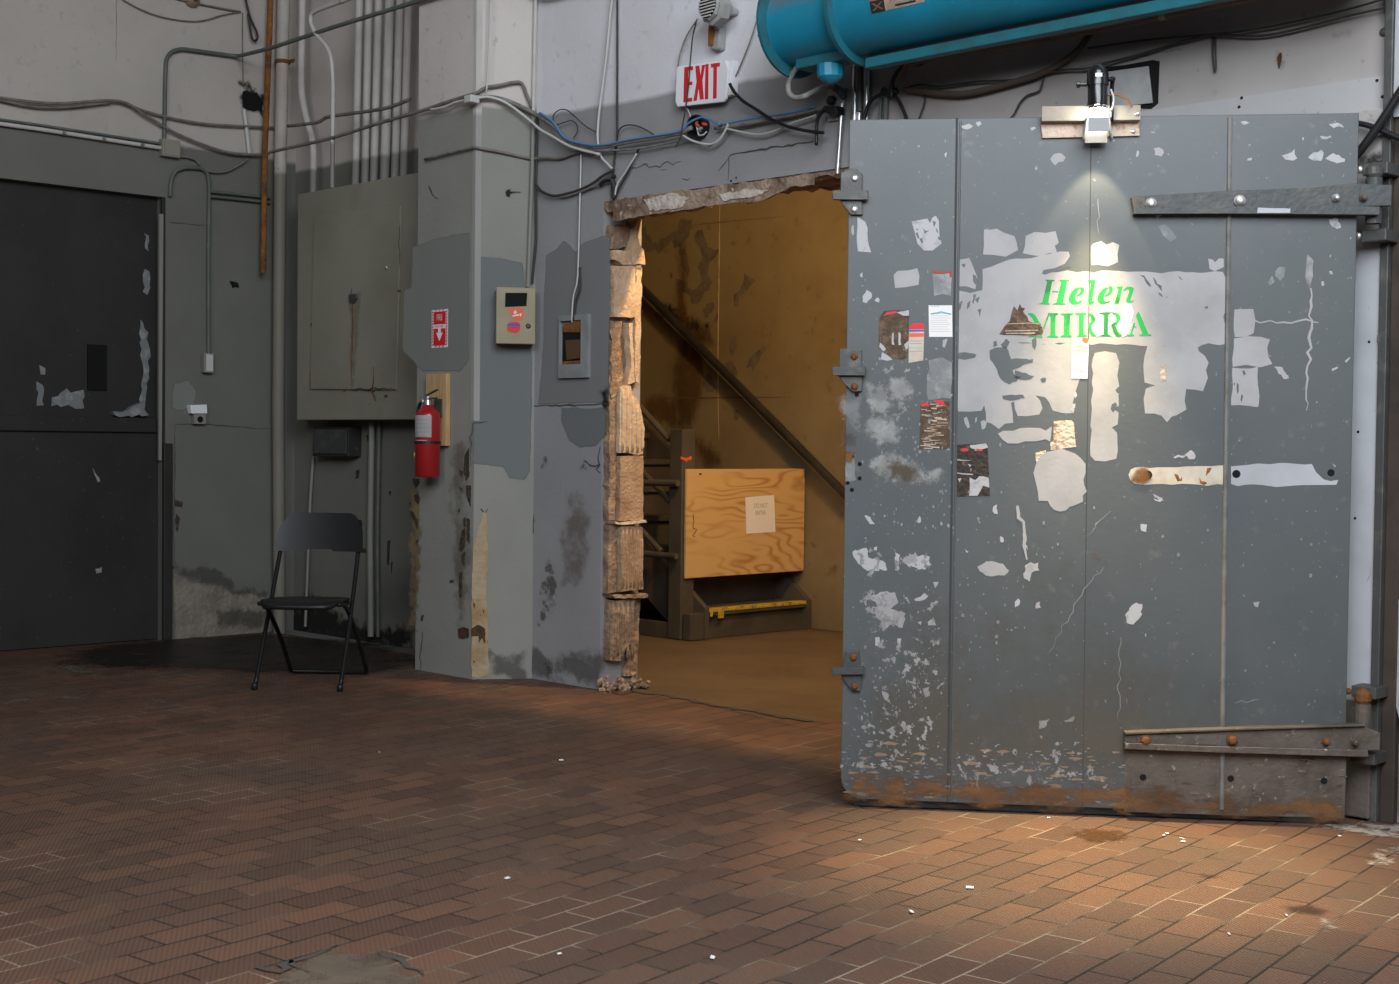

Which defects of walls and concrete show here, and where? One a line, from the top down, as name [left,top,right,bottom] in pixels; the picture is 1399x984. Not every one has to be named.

spalling [604,167,849,323]
peeling [1156,215,1176,242]
peeling [1305,255,1333,289]
peeling [36,365,85,409]
peeling [109,319,151,417]
peeling [871,229,1289,511]
flaking render [450,448,489,678]
peeling [840,515,1107,789]
corrosion [847,775,1342,821]